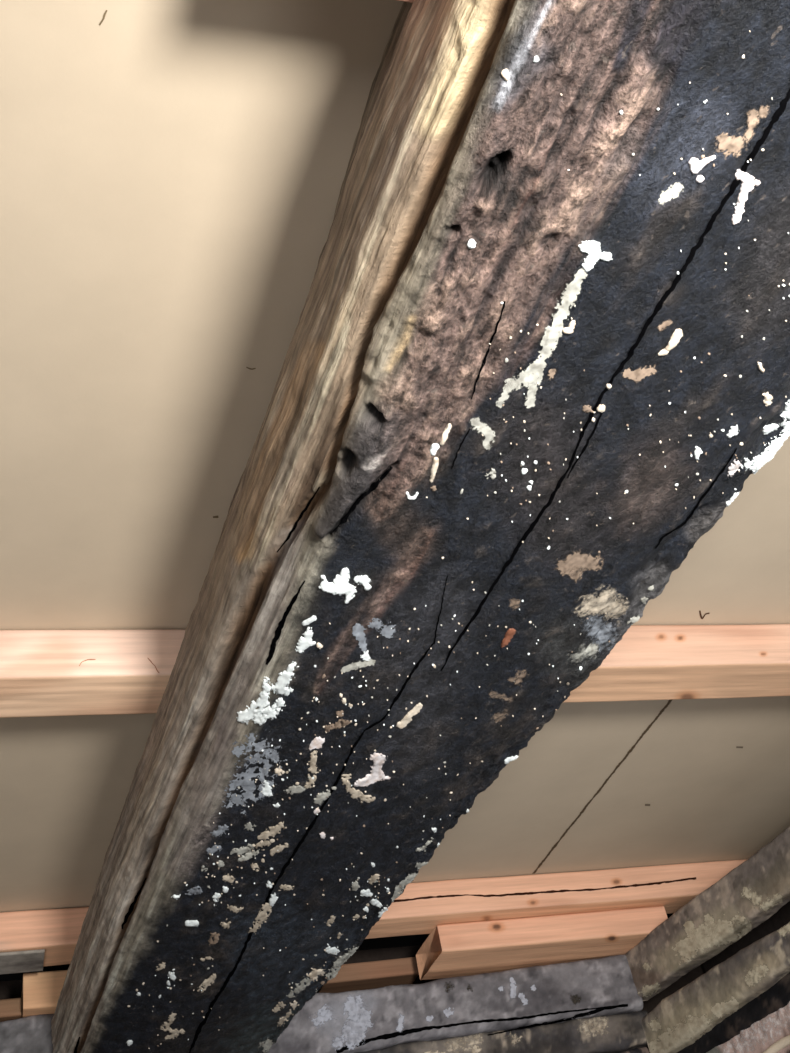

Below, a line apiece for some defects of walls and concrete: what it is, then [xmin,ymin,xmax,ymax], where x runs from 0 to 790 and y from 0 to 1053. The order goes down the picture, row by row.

leakage [496,369,557,408]
leakage [429,423,452,491]
crack [189,89,790,1053]
leakage [367,618,396,638]
leakage [341,650,376,673]
leakage [305,750,319,789]
leakage [266,881,294,906]
leakage [498,977,536,1006]